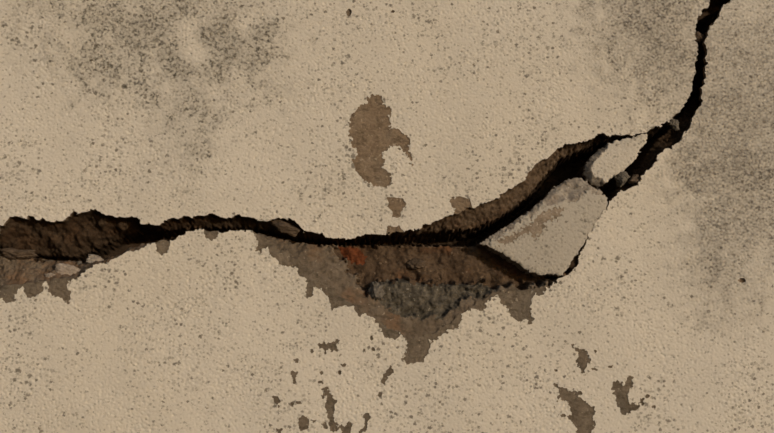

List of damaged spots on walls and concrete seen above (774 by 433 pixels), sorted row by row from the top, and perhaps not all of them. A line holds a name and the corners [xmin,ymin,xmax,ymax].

crack [0,0,730,263]
peeling [348,94,413,236]
peeling [446,196,472,218]
spalling [0,240,170,304]
crack [563,240,586,275]
spalling [253,231,570,364]
peeling [298,371,371,433]
peeling [377,365,394,397]
peeling [554,383,596,433]
peeling [571,344,598,375]
peeling [611,376,655,415]